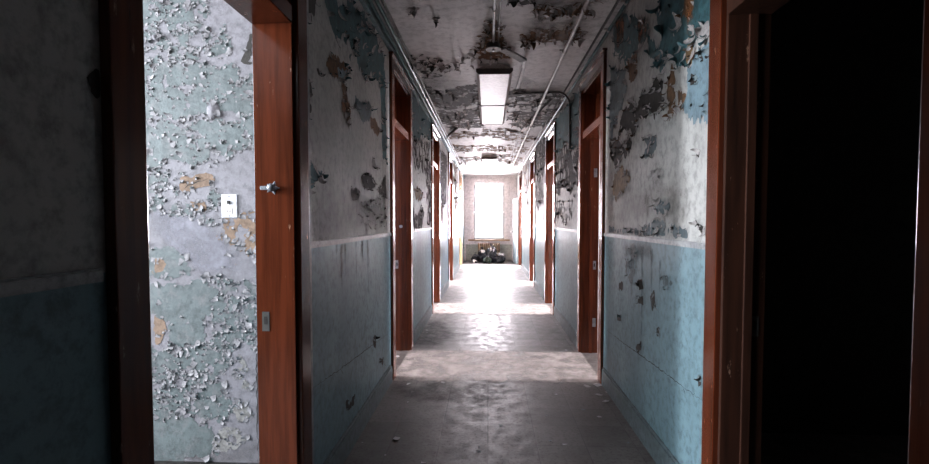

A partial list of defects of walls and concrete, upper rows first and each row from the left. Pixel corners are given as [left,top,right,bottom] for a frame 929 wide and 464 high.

peeling [308,0,391,229]
peeling [406,0,602,229]
peeling [604,0,710,202]
peeling [143,0,257,463]